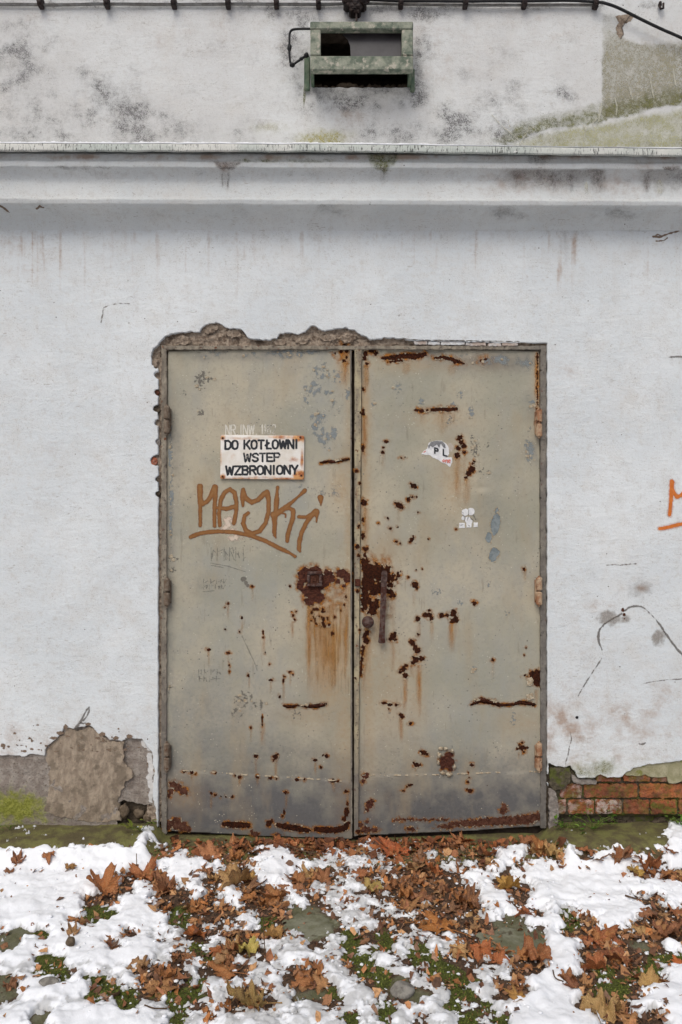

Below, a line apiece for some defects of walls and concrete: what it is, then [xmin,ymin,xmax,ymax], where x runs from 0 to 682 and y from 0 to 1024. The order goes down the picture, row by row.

corrosion [362,350,465,367]
corrosion [453,435,476,479]
flaking render [0,323,547,827]
corrosion [288,497,430,679]
corrosion [392,802,540,832]
flaking render [546,760,682,829]